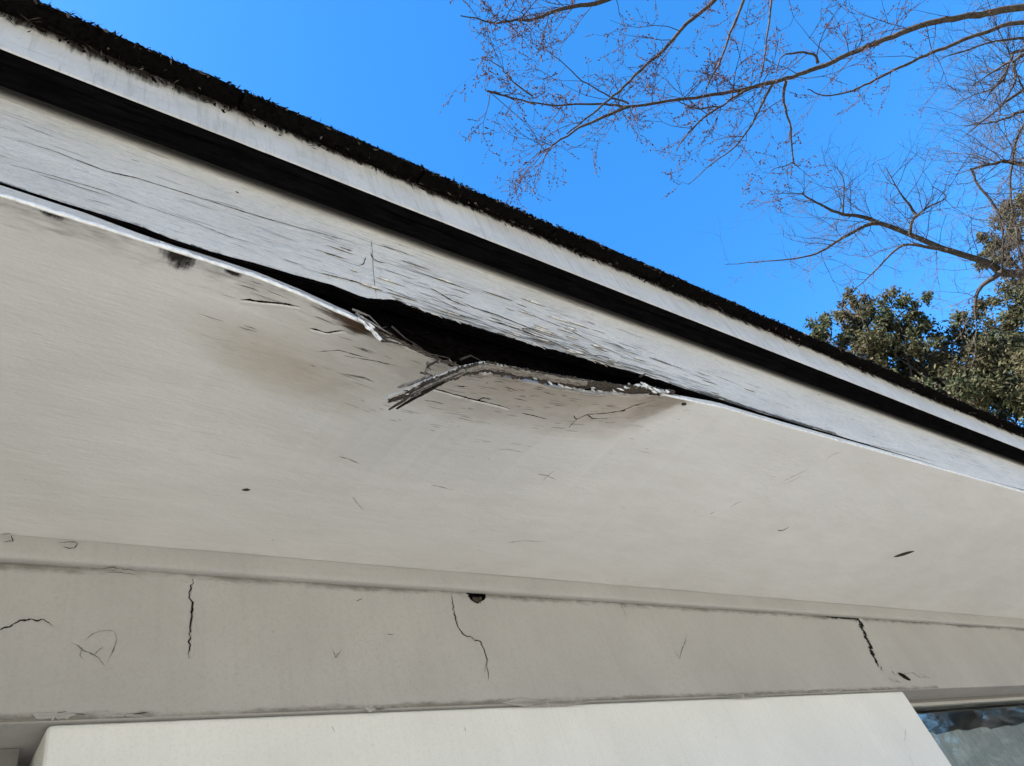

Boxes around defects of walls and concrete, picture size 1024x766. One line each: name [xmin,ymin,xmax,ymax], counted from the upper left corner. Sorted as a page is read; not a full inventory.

peeling [349,269,718,395]
crack [0,619,52,630]
crack [72,630,117,666]
crack [188,578,197,659]
crack [451,594,490,680]
crack [826,616,887,671]